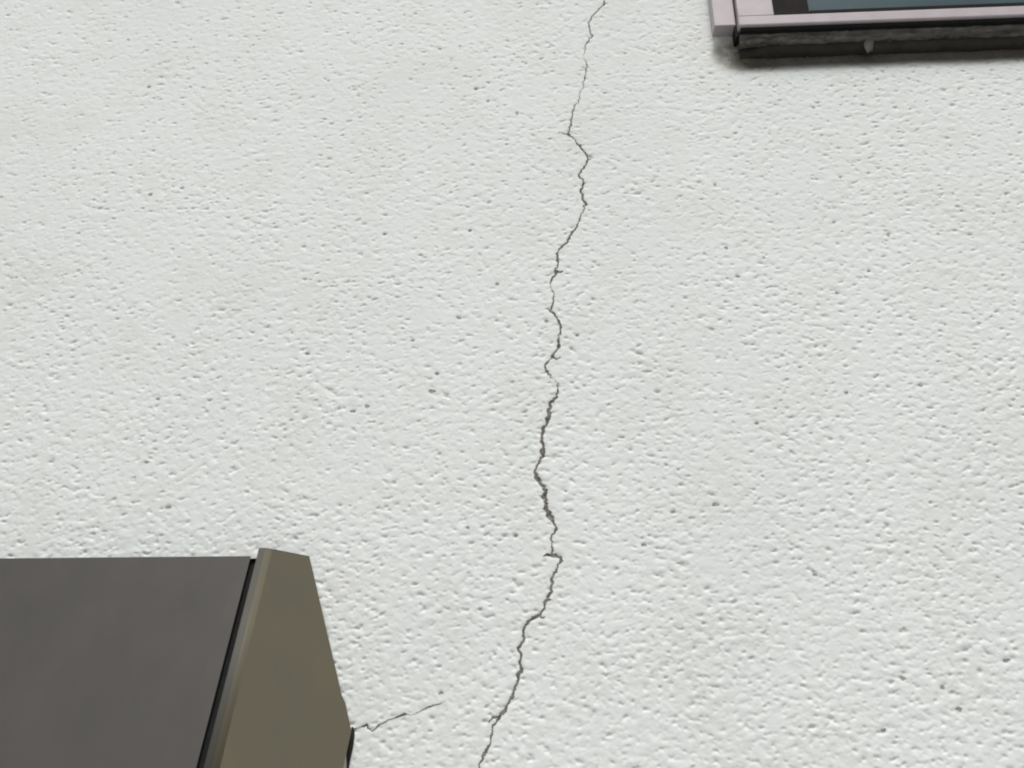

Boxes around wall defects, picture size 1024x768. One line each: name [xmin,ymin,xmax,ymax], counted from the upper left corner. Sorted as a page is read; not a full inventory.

crack [354,701,445,732]
crack [478,1,605,768]